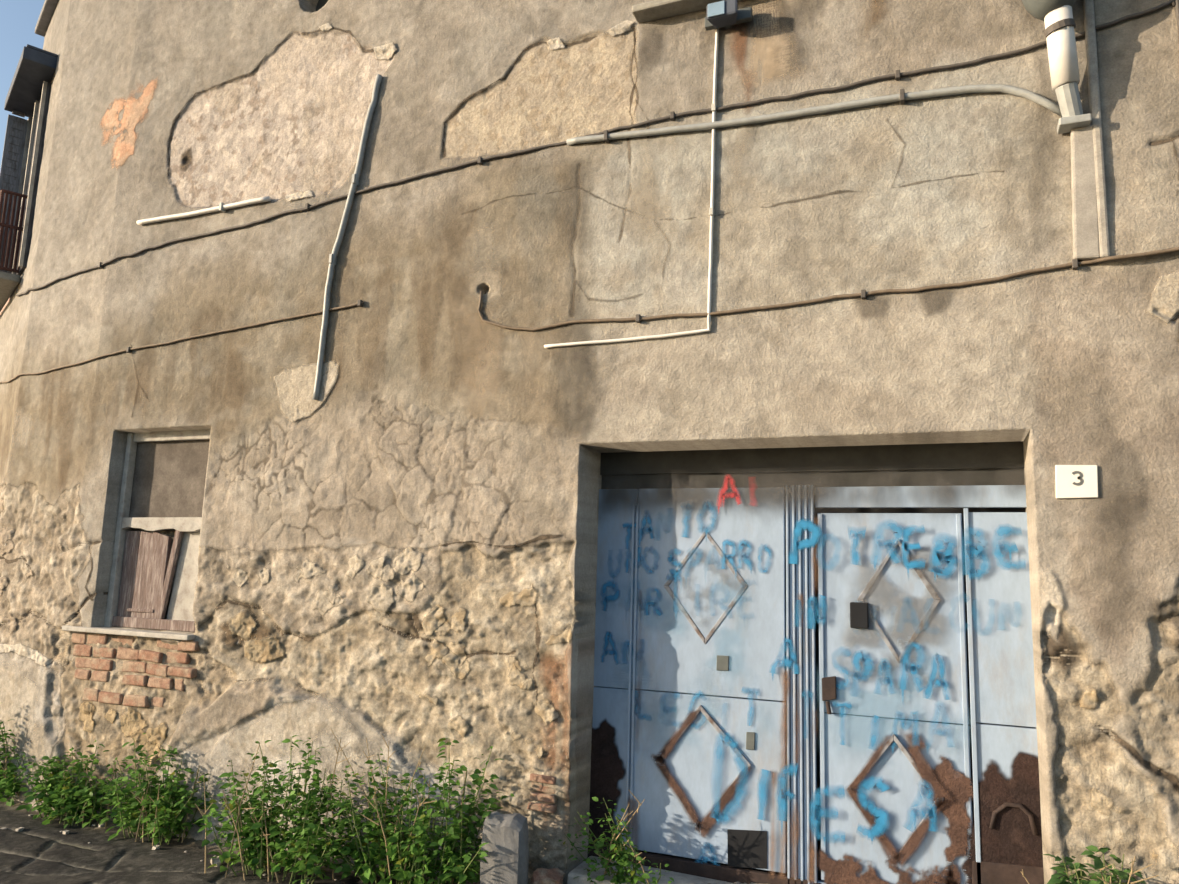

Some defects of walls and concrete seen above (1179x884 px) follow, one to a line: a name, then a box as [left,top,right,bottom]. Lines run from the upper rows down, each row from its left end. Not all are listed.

peeling [101,79,157,167]
spalling [168,22,397,208]
spalling [441,20,638,159]
crack [470,42,694,317]
crack [771,190,855,207]
crack [901,171,1004,187]
crack [1149,135,1179,180]
spalling [1147,272,1179,323]
peeling [322,365,337,396]
spalling [0,482,576,880]
spalling [1041,571,1179,884]